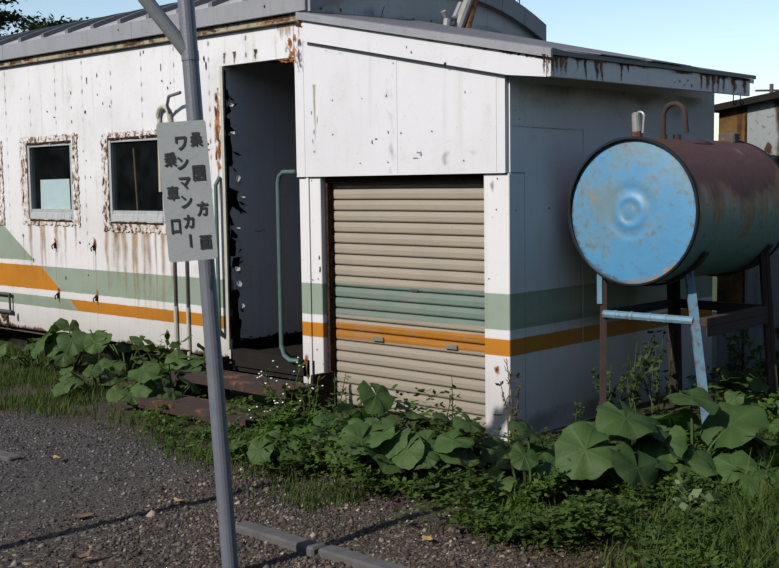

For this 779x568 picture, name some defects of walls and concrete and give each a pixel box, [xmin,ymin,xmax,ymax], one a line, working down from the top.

rust [260,15,300,68]
rust [542,54,607,80]
rust [676,70,750,93]
rust [719,106,745,141]
rust [764,100,779,165]
peeling [18,133,81,227]
peeling [100,129,166,234]
rust [75,228,150,270]
rust [717,272,743,314]
rust [0,313,46,331]